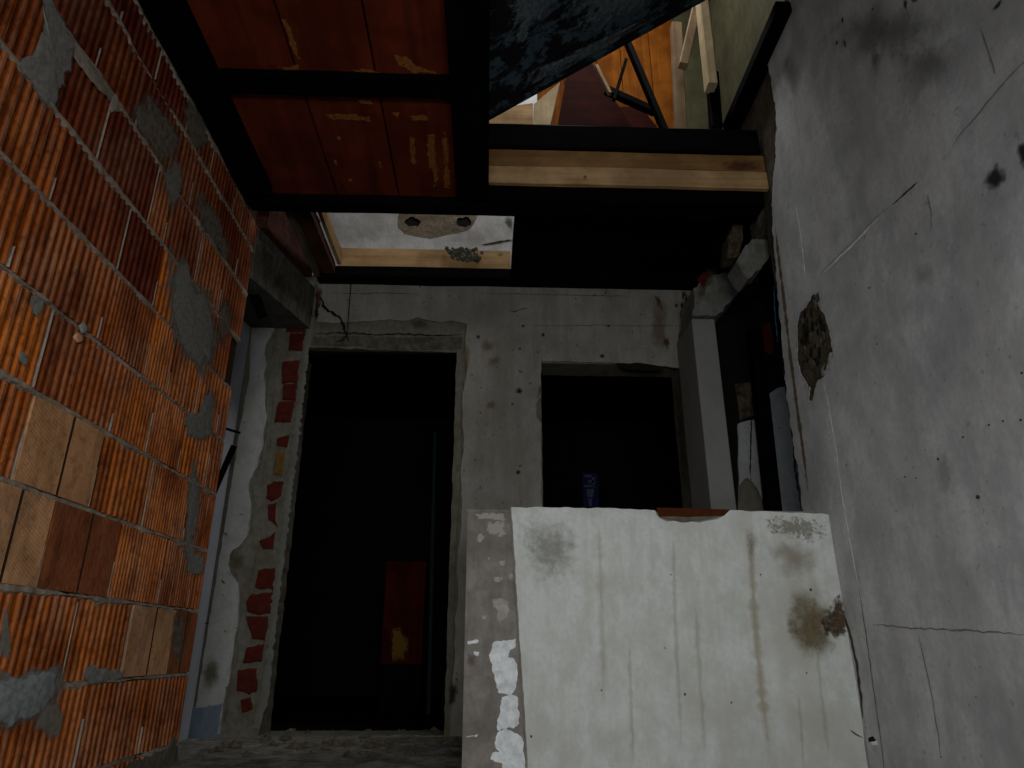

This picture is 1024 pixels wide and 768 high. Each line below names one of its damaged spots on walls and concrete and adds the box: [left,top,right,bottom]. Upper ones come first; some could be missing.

crack [314,291,461,342]
flaking render [797,292,833,401]
peeling [451,324,525,768]
rust [823,595,846,637]
crack [850,580,1023,766]